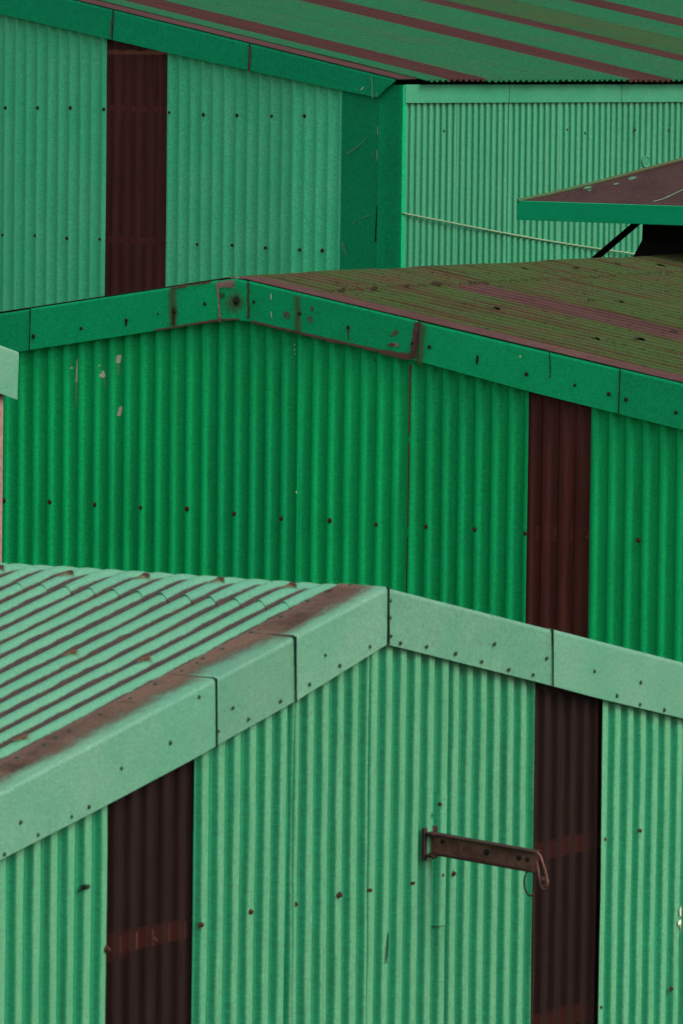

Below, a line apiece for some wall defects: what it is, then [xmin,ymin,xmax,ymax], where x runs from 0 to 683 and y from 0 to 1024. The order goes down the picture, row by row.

rust [154,281,425,593]